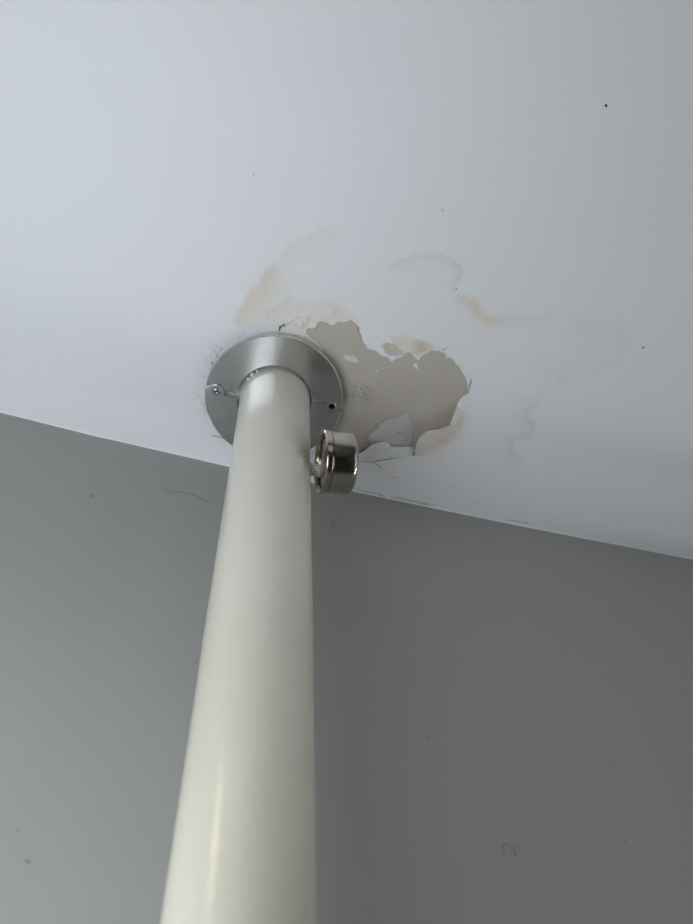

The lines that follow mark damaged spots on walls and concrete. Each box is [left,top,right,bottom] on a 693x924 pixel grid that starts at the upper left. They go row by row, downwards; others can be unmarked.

water stain [230,222,349,338]
peeling [305,320,472,468]